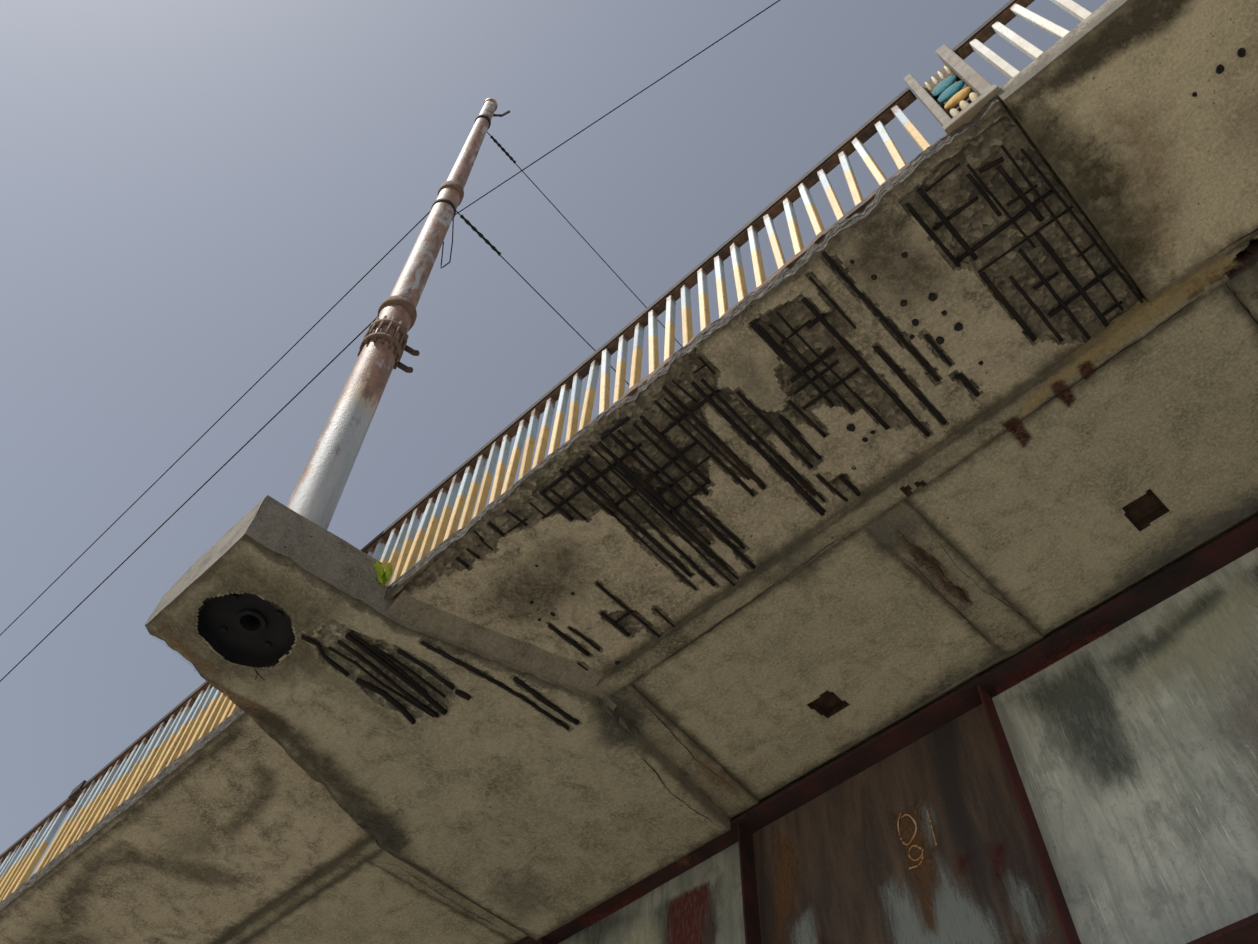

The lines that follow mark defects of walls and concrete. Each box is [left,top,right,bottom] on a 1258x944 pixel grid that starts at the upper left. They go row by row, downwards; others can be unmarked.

spalling [896,112,1144,346]
hole [1222,238,1258,280]
rust [1051,380,1075,407]
rust [1079,361,1095,379]
spalling [388,251,984,607]
rust [1003,417,1031,447]
spalling [593,580,676,639]
spalling [538,612,603,671]
spalling [298,619,583,732]